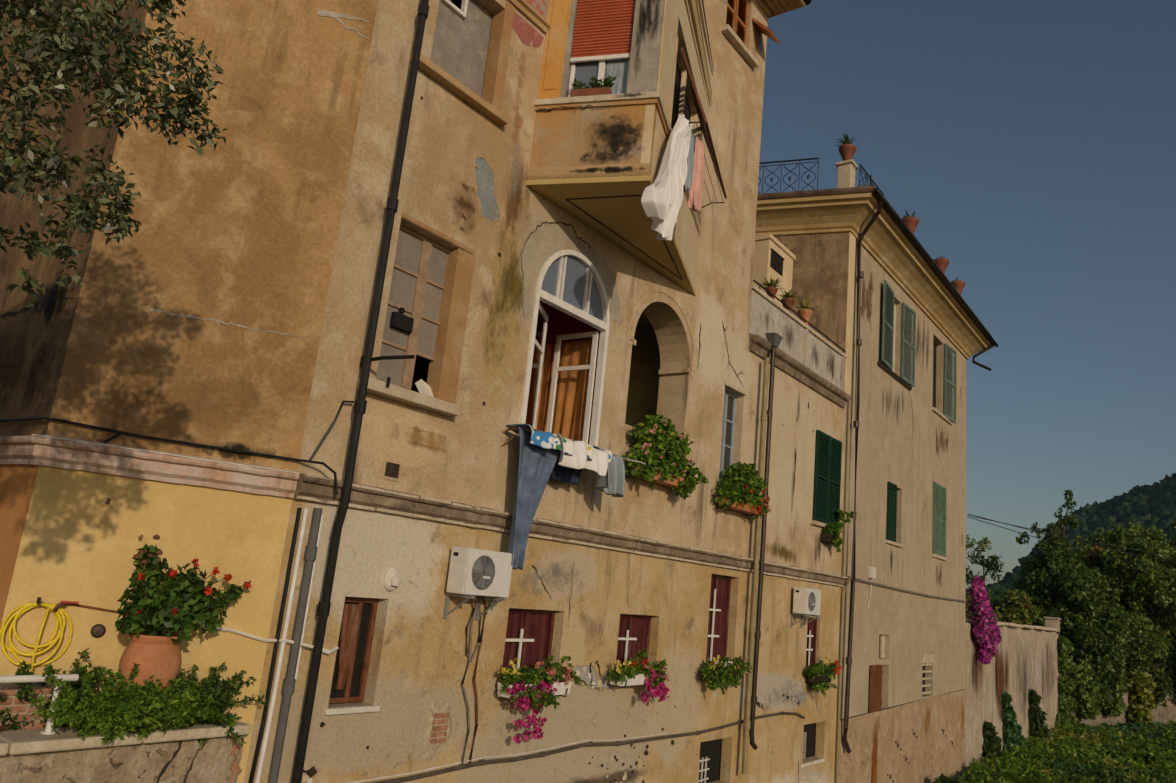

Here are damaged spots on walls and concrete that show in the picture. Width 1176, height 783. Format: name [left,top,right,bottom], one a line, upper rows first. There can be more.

crack [317,9,371,39]
water stain [637,0,659,68]
water stain [580,122,637,173]
peeling [471,152,501,227]
crack [521,221,591,318]
crack [150,308,311,341]
spalling [423,700,452,765]
rust [871,723,879,783]